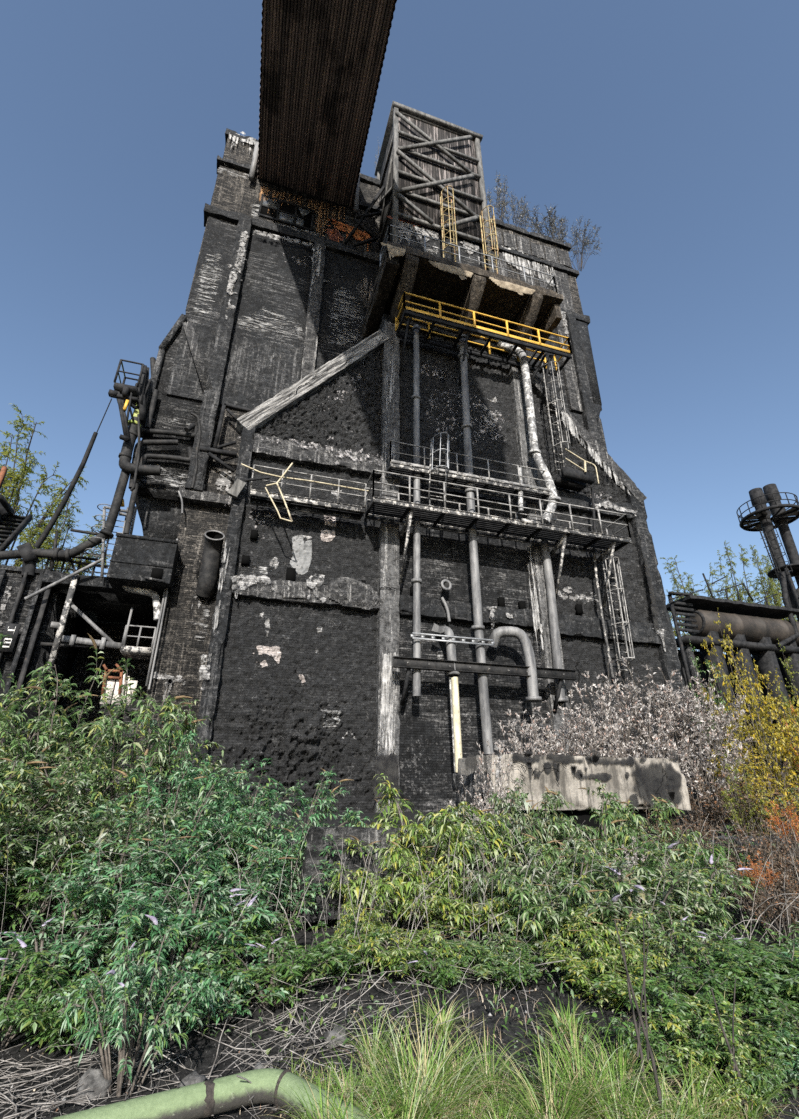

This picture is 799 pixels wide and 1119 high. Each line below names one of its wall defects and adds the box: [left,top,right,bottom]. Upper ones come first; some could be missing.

rust [259,187,372,251]
peeling [320,515,336,542]
peeling [253,612,281,668]
water stain [465,754,478,769]
water stain [512,750,684,826]